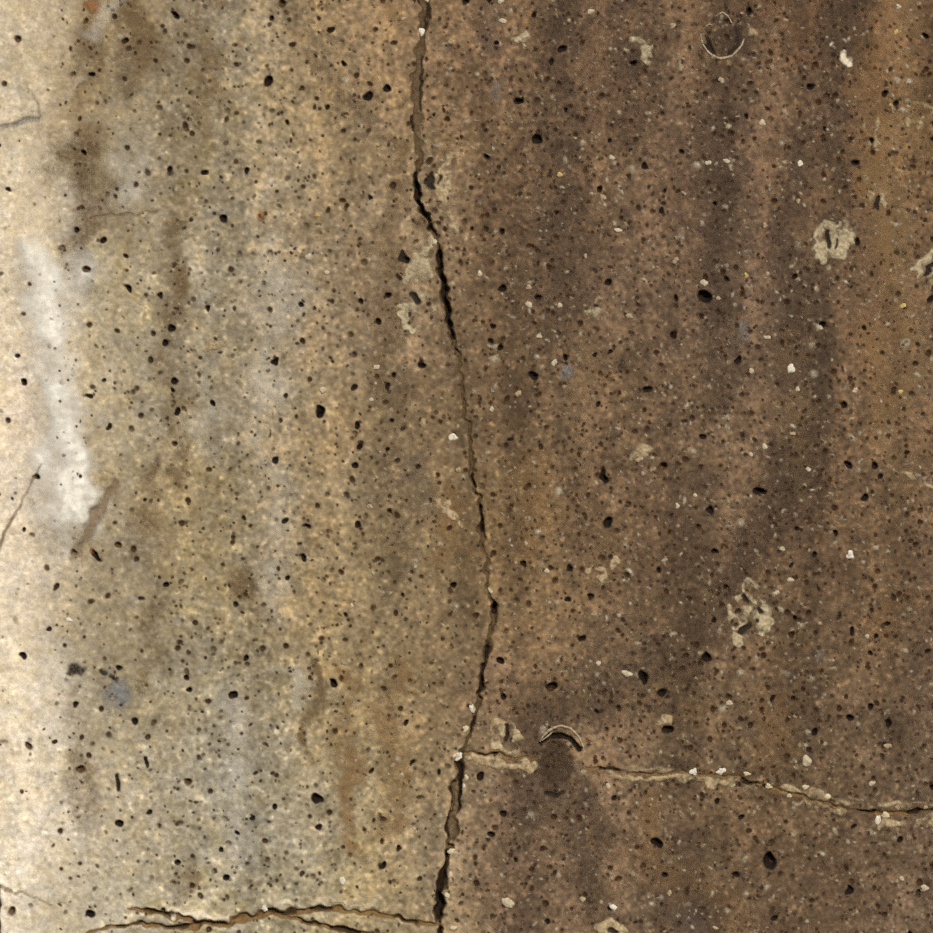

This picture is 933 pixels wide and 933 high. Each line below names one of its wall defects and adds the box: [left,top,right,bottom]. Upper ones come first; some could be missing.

crack [86,0,537,933]
damp [468,0,933,933]
crack [71,478,119,559]
crack [584,766,933,830]
crack [0,885,23,929]